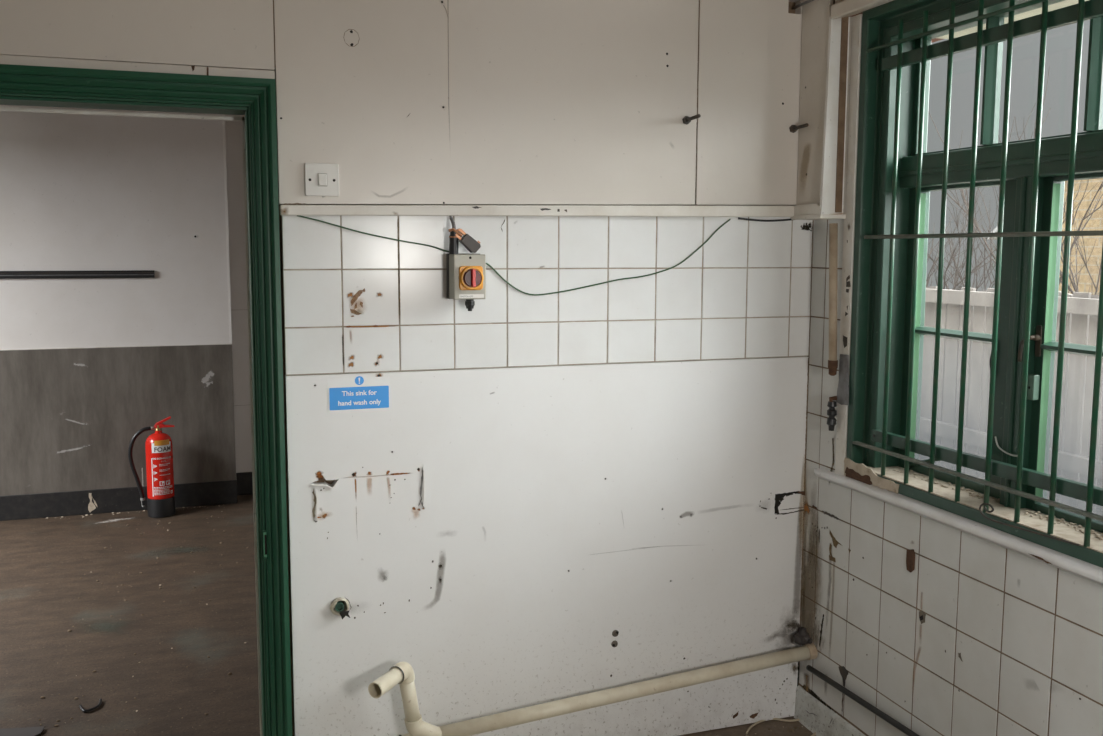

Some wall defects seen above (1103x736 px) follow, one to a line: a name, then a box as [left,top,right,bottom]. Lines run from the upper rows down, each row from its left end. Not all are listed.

flaking render [844,458,900,494]
spalling [774,491,805,515]